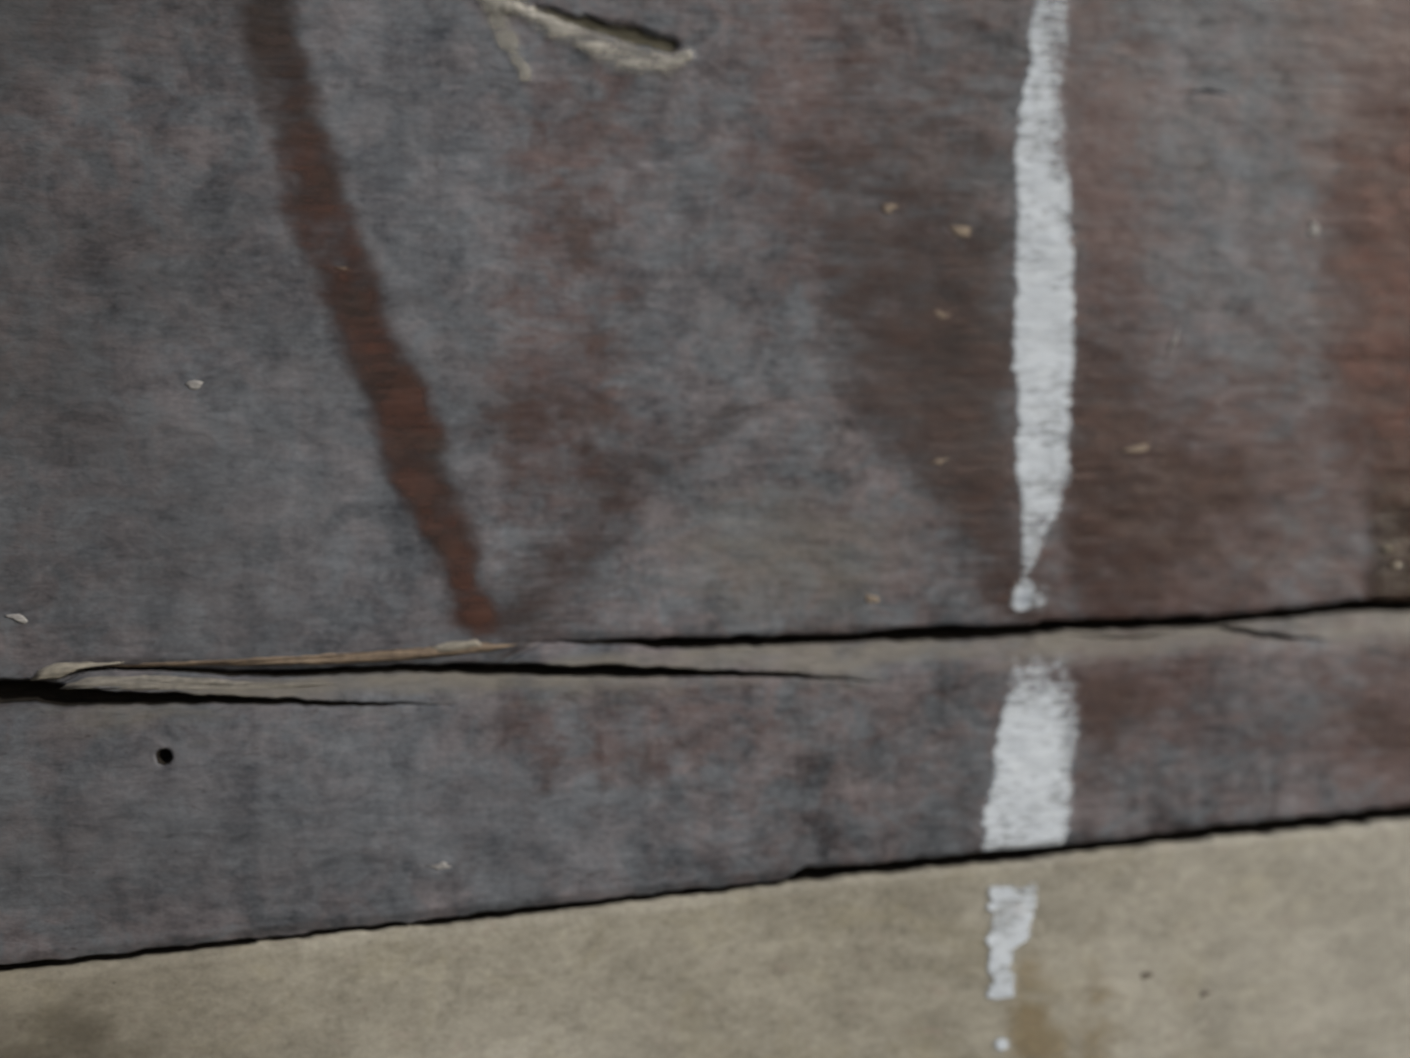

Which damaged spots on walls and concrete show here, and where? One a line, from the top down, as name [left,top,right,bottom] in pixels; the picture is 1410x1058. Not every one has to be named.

rust [244,0,499,634]
water stain [829,0,1075,617]
crack [0,599,1410,706]
water stain [982,664,1078,850]
crack [0,805,1410,971]
water stain [986,886,1037,999]
water stain [996,1038,1009,1050]